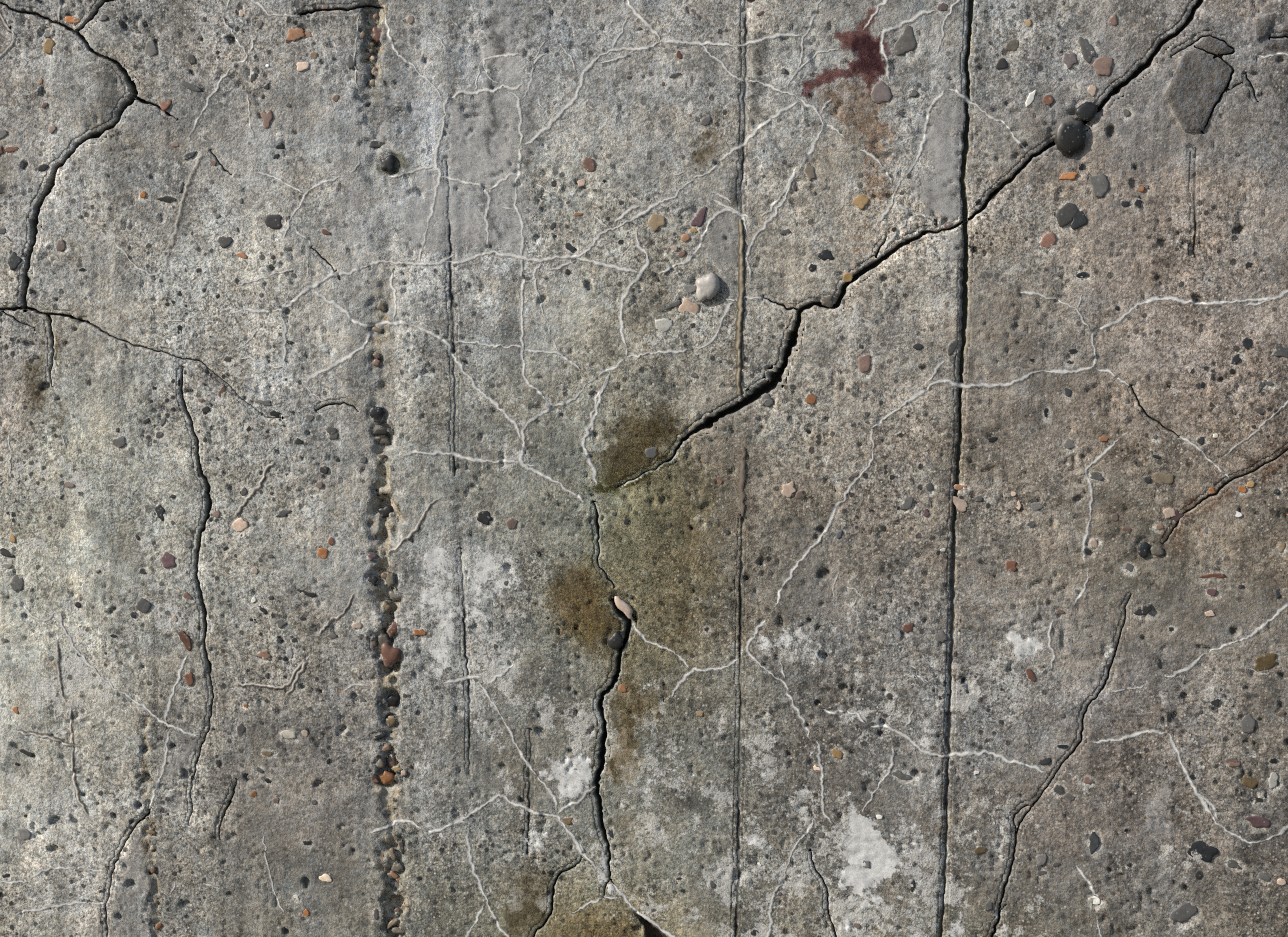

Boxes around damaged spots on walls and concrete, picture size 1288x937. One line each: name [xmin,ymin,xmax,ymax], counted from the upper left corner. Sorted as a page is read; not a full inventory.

crack [1076,0,1288,133]
crack [0,0,309,937]
crack [240,0,1057,937]
crack [775,290,1288,605]
damp [519,823,549,867]
damp [539,748,592,812]
damp [598,849,617,898]
spalling [634,912,667,937]
damp [628,760,697,807]
crack [822,593,1288,937]